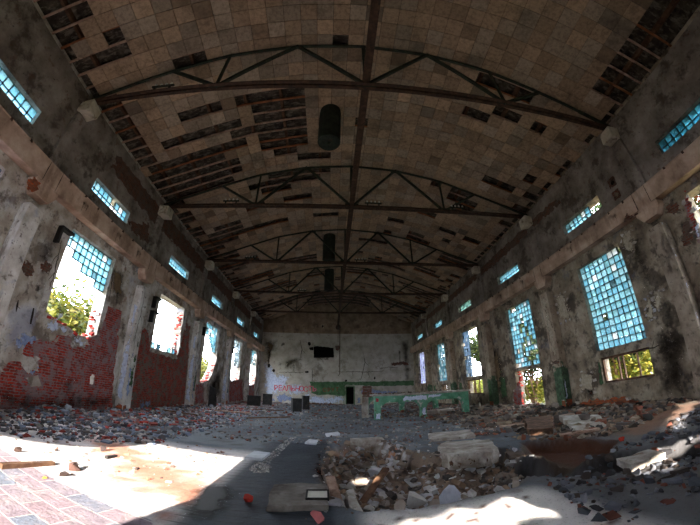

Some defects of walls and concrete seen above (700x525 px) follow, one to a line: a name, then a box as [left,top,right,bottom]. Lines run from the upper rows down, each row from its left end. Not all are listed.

flaking render [665,191,700,247]
flaking render [0,304,217,411]
flaking render [222,369,255,404]
damp [657,333,684,394]